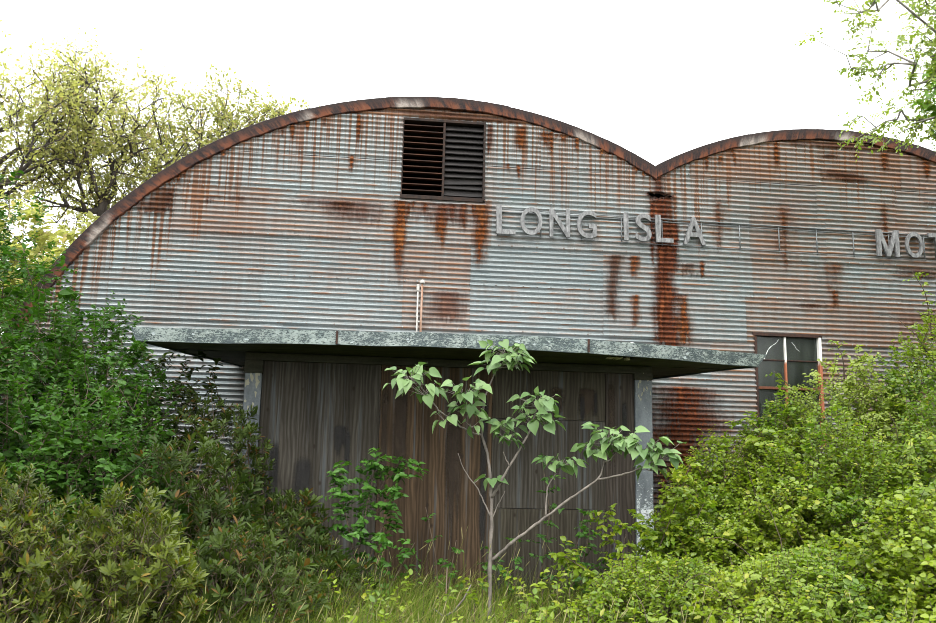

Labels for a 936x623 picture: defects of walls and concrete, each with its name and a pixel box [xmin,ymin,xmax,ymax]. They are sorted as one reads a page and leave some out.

corrosion [281,121,310,139]
corrosion [541,131,579,156]
corrosion [792,142,896,171]
corrosion [823,170,867,183]
corrosion [136,171,186,214]
corrosion [318,199,369,217]
corrosion [393,200,488,269]
corrosion [650,176,705,346]
corrosion [607,255,640,318]
corrosion [435,292,459,322]
corrosion [652,386,725,528]